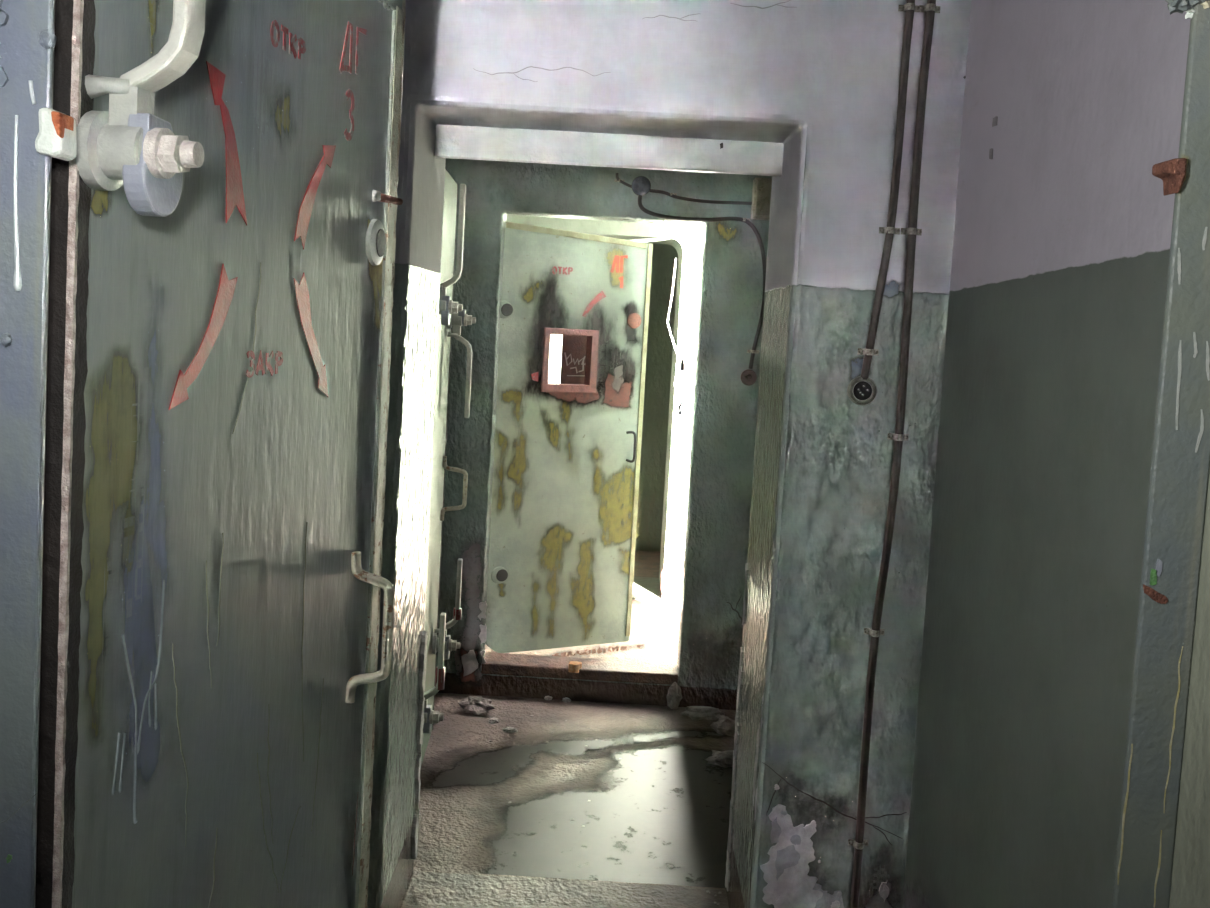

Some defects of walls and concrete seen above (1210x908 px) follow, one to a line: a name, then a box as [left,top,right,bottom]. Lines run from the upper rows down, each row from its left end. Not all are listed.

crack [643,13,699,21]
crack [730,0,790,9]
flaking render [1165,0,1210,19]
crack [473,66,611,82]
peeling [663,277,700,602]
peeling [760,774,846,908]